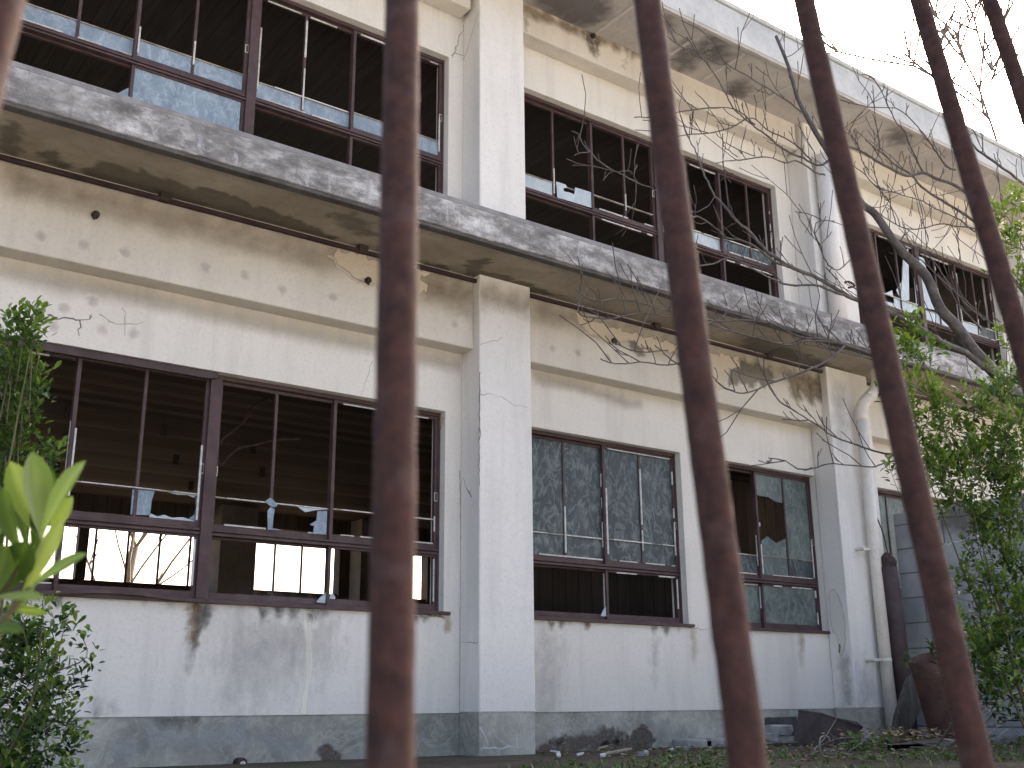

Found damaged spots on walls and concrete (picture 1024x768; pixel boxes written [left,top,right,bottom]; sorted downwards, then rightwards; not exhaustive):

damp [524,0,639,56]
damp [84,163,335,240]
peeling [327,248,378,289]
peeling [418,270,430,301]
crack [48,308,143,336]
peeling [576,313,677,354]
damp [729,338,841,403]
crack [459,372,525,603]